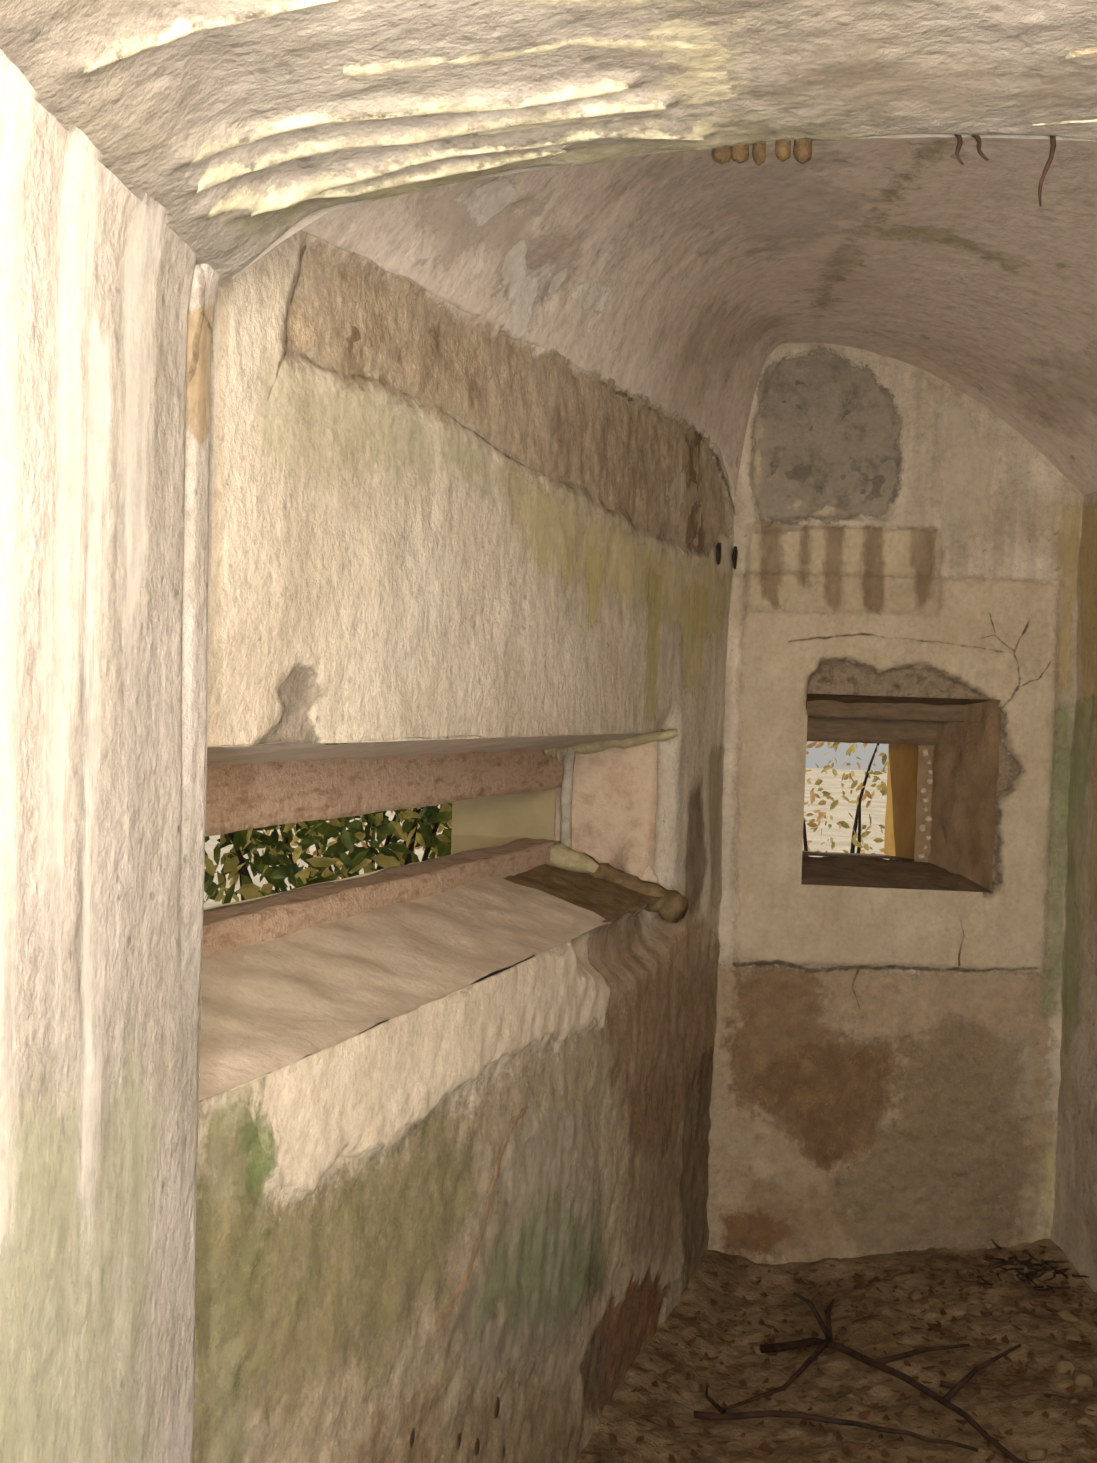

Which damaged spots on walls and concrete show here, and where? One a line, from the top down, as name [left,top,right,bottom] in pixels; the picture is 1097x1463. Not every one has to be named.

crack [1033,118,1097,126]
spalling [750,347,902,525]
damp [509,465,729,721]
peeling [735,571,1058,973]
damp [588,747,915,1291]